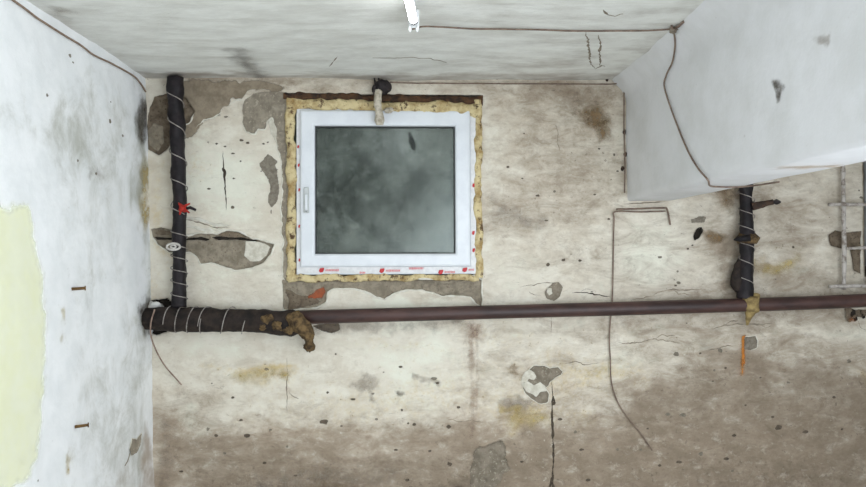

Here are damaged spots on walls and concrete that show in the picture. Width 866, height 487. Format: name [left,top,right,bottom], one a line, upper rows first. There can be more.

crack [585,34,605,69]
leakage [137,100,147,142]
flaking render [147,94,170,155]
leakage [583,106,609,139]
crack [220,159,228,204]
flaking render [183,78,484,311]
flaking render [151,227,173,253]
flaking render [829,230,861,274]
peeling [521,365,563,404]
crack [548,388,556,487]
flaking render [470,441,510,487]